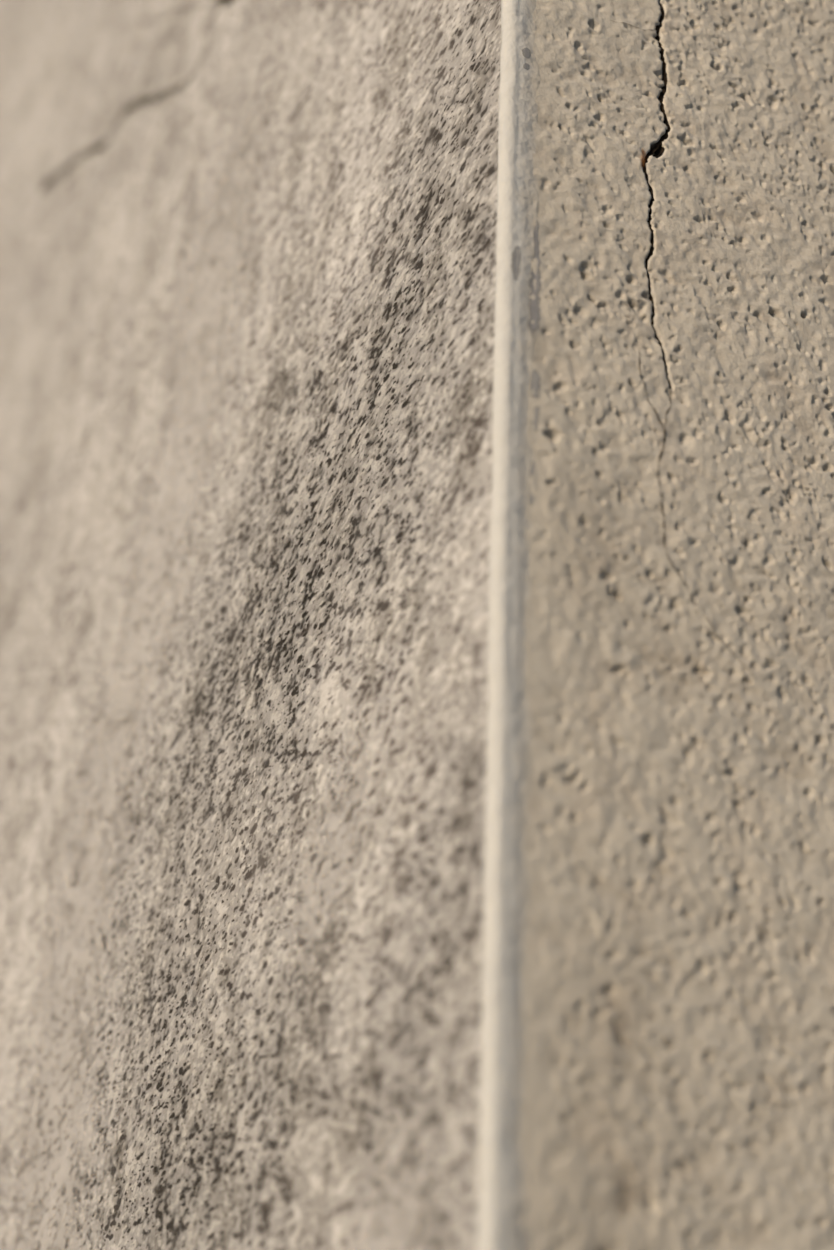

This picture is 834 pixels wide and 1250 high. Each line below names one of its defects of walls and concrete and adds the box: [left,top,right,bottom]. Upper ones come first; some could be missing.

crack [39,49,205,193]
crack [621,0,686,585]